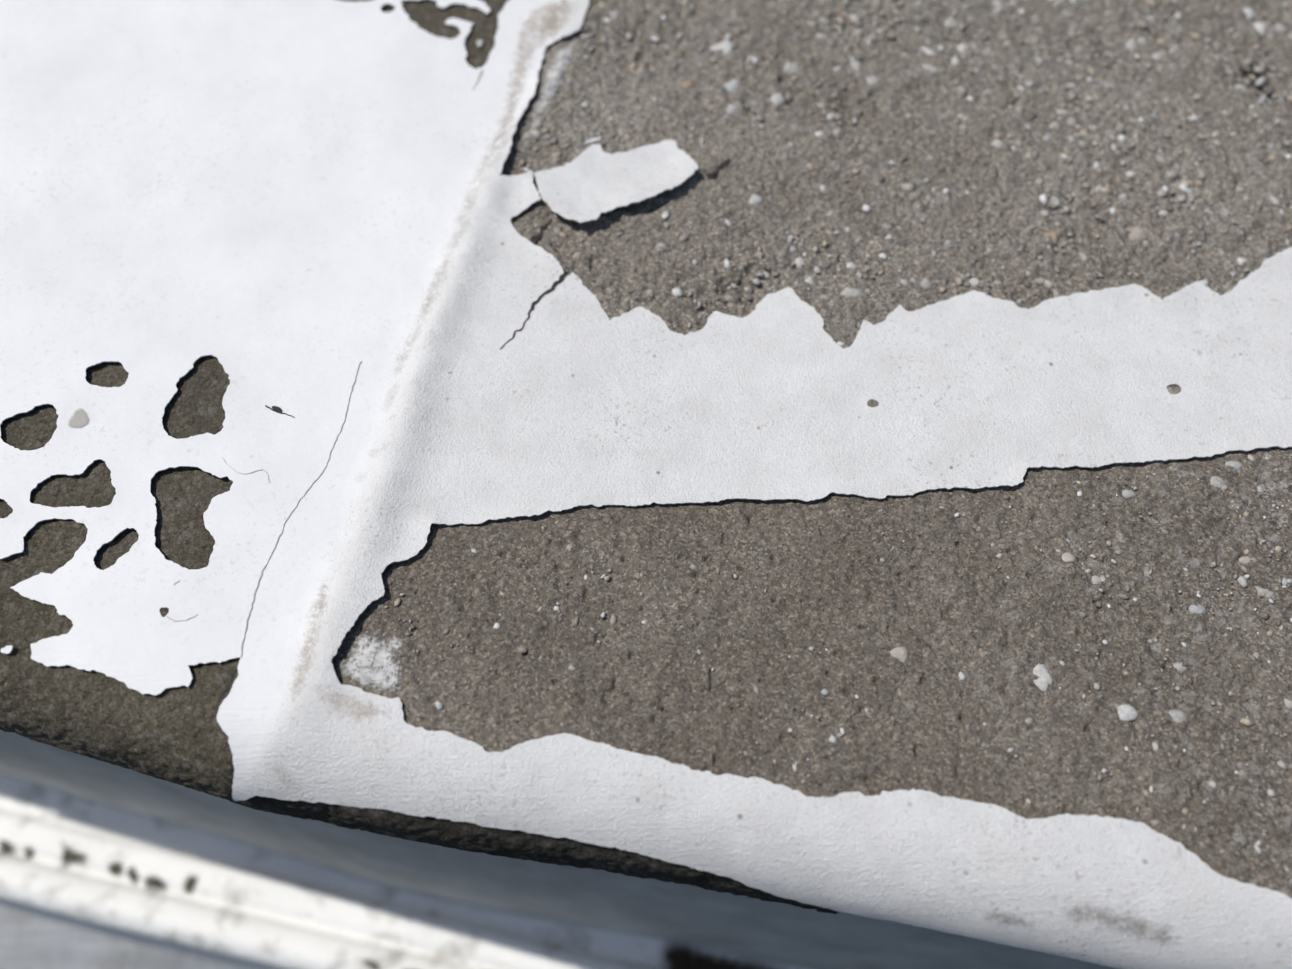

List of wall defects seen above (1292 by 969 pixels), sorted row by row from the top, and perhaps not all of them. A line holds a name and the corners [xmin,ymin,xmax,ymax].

peeling [342,0,508,69]
crack [706,159,730,178]
spalling [501,0,1292,348]
crack [530,222,551,243]
crack [500,270,569,349]
peeling [1,404,58,451]
peeling [86,362,129,387]
peeling [162,356,230,439]
peeling [0,460,840,914]
spalling [332,447,1292,899]